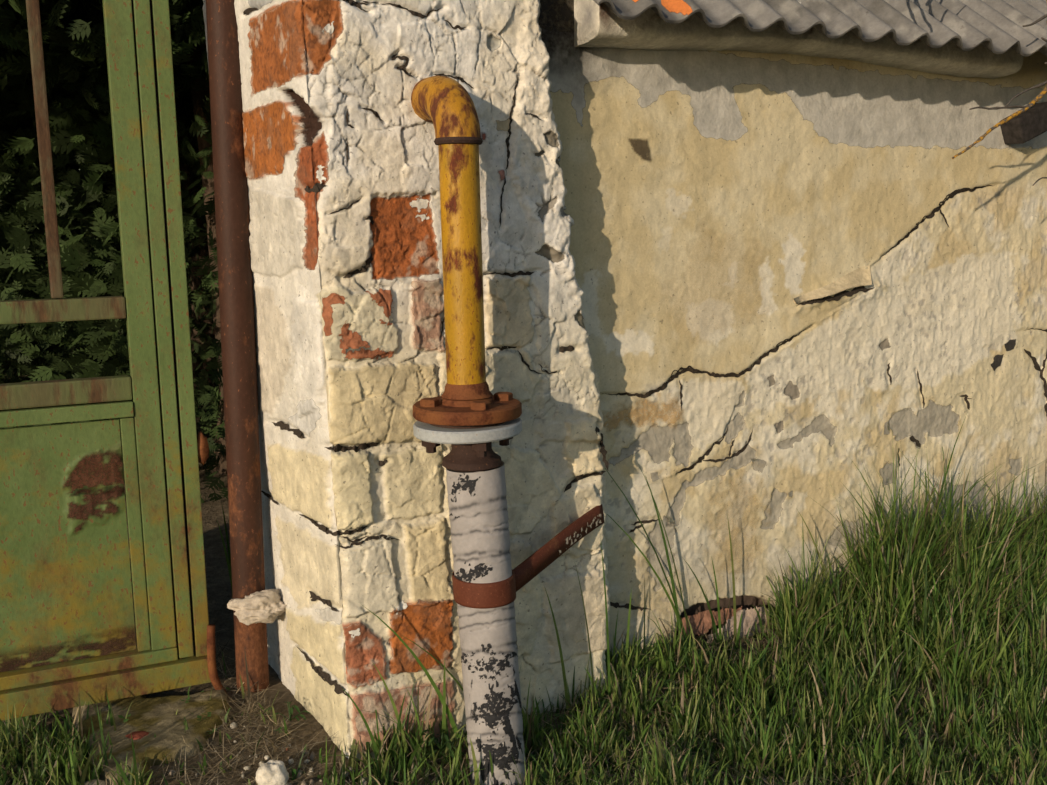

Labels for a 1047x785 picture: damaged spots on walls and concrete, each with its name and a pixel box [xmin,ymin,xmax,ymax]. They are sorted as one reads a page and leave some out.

spalling [242,0,344,270]
spalling [366,193,442,351]
spalling [322,293,394,360]
crack [602,286,873,411]
crack [1024,328,1047,417]
peeling [774,415,837,449]
peeling [884,399,960,449]
rust [63,452,125,531]
peeling [609,391,766,592]
rust [0,628,136,672]
spalling [315,599,454,737]
spalling [677,606,774,645]